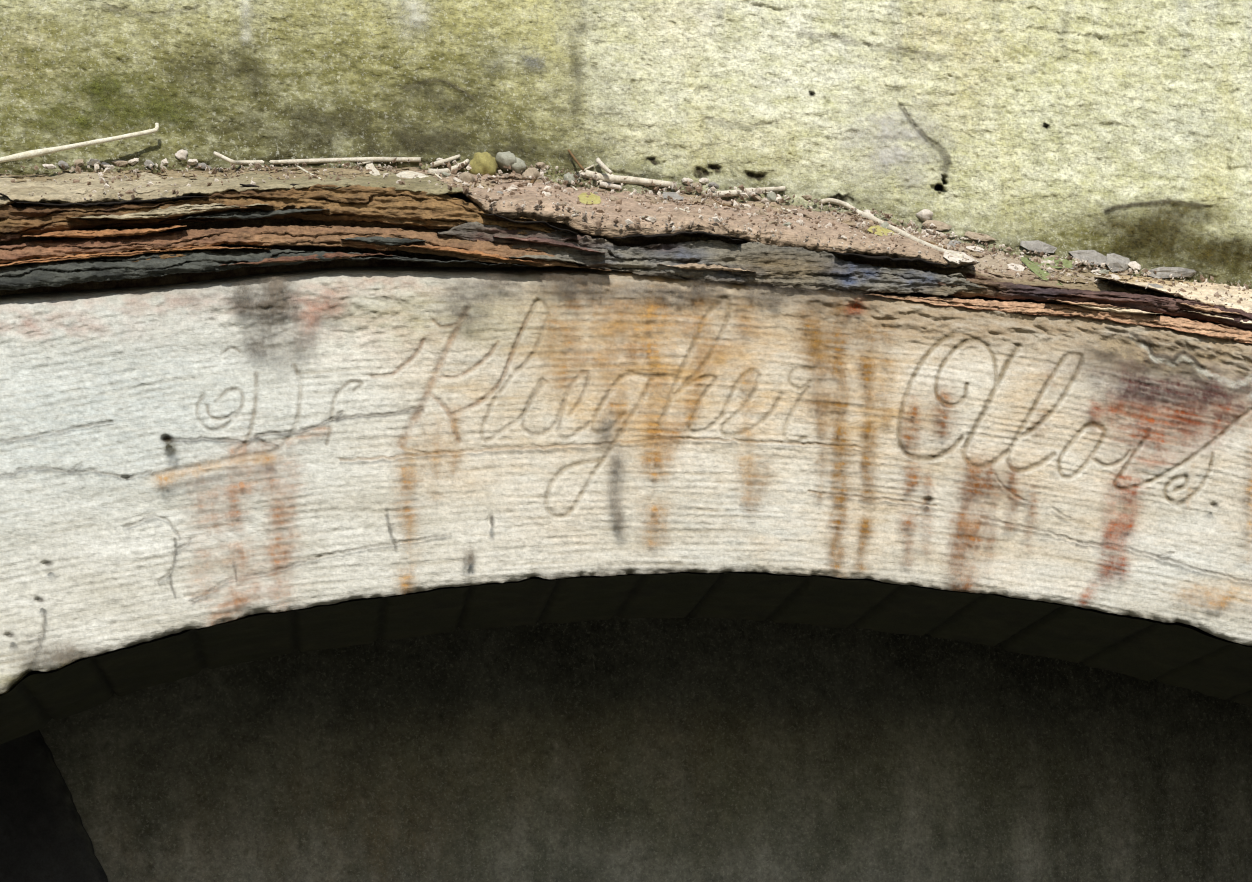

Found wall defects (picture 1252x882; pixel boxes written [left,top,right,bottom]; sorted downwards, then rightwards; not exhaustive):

damp [394,127,535,155]
peeling [0,171,1252,381]
corrosion [627,298,679,386]
corrosion [646,378,700,476]
corrosion [860,358,888,494]
corrosion [1092,401,1232,443]
corrosion [814,398,848,568]
corrosion [906,468,931,491]
corrosion [966,466,994,494]
corrosion [859,518,872,570]
corrosion [957,513,994,542]
corrosion [1103,515,1134,573]